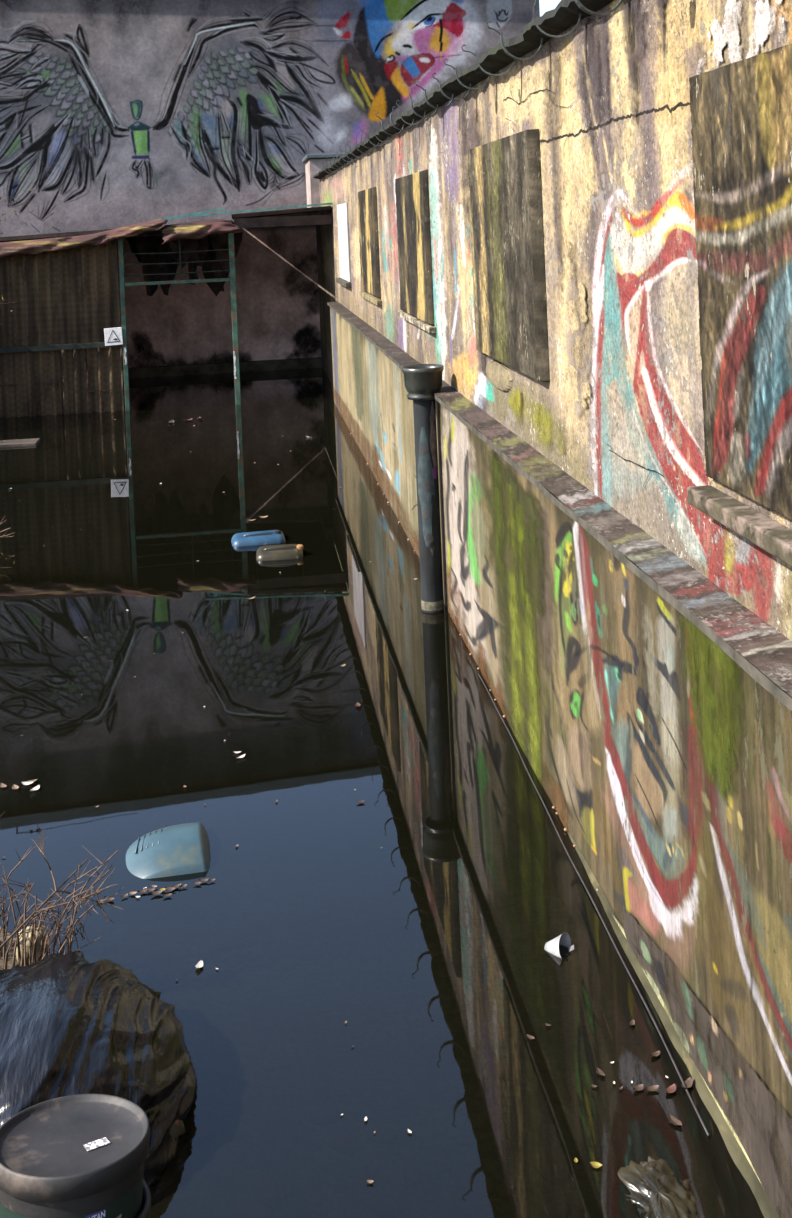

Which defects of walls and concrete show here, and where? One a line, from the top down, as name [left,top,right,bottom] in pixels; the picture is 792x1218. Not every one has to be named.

peeling [697,0,784,75]
crack [503,85,690,150]
leakage [494,459,541,776]